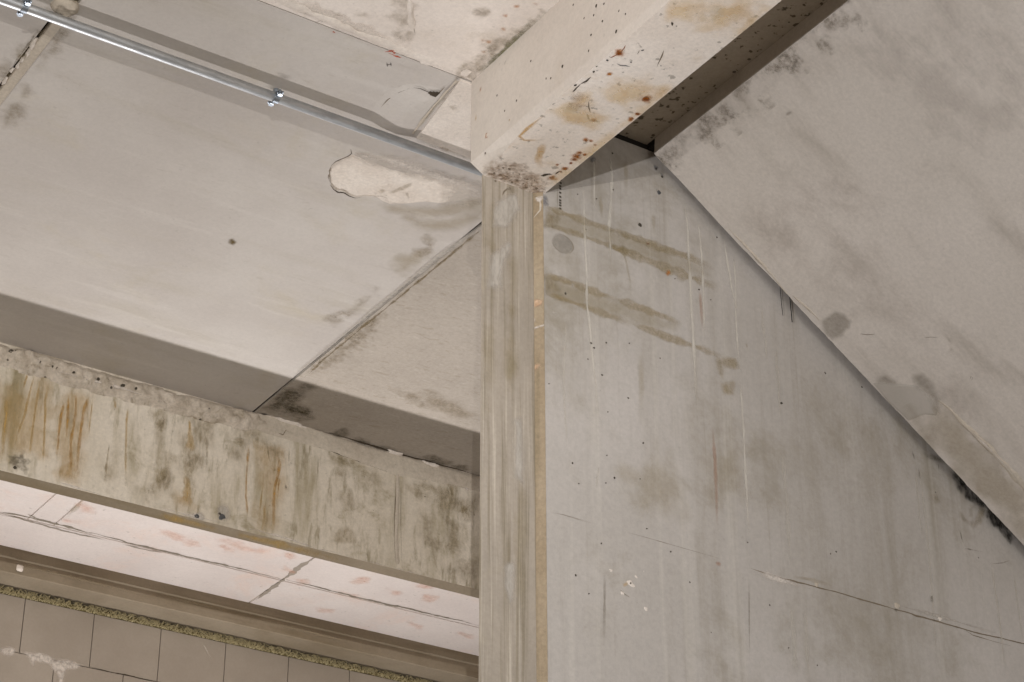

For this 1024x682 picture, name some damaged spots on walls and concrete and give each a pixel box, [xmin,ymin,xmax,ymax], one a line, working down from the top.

spalling [328,152,482,204]
crack [0,512,468,623]
crack [754,569,1024,646]